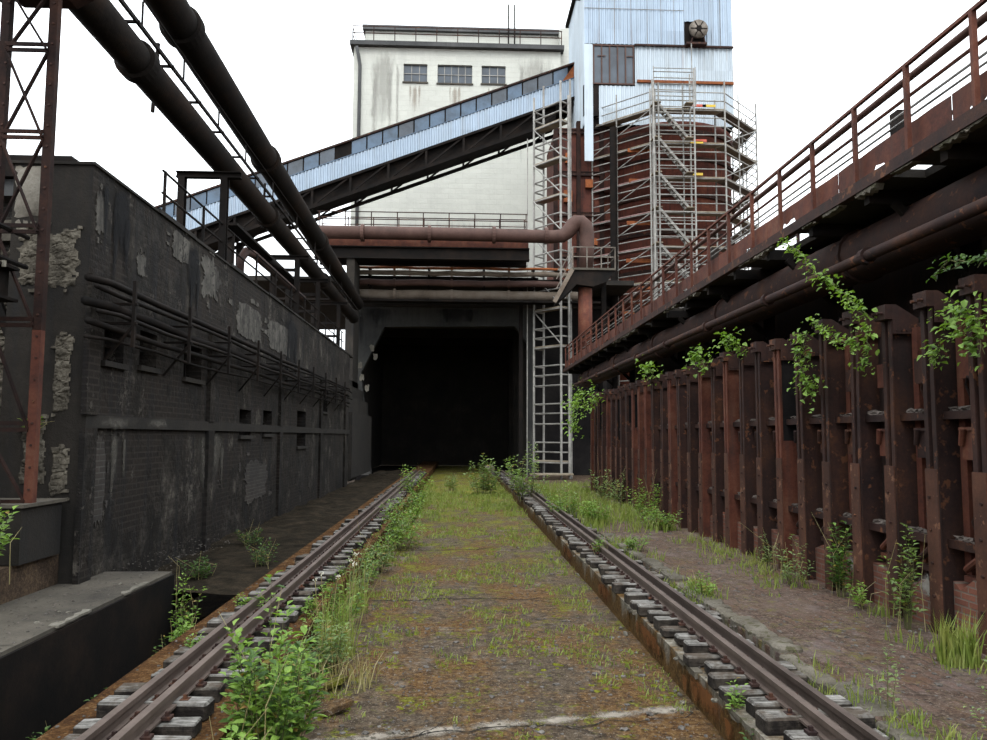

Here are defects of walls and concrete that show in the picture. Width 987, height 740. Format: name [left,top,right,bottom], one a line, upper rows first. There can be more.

spalling [16,228,37,292]
spalling [48,226,83,293]
spalling [37,331,75,500]